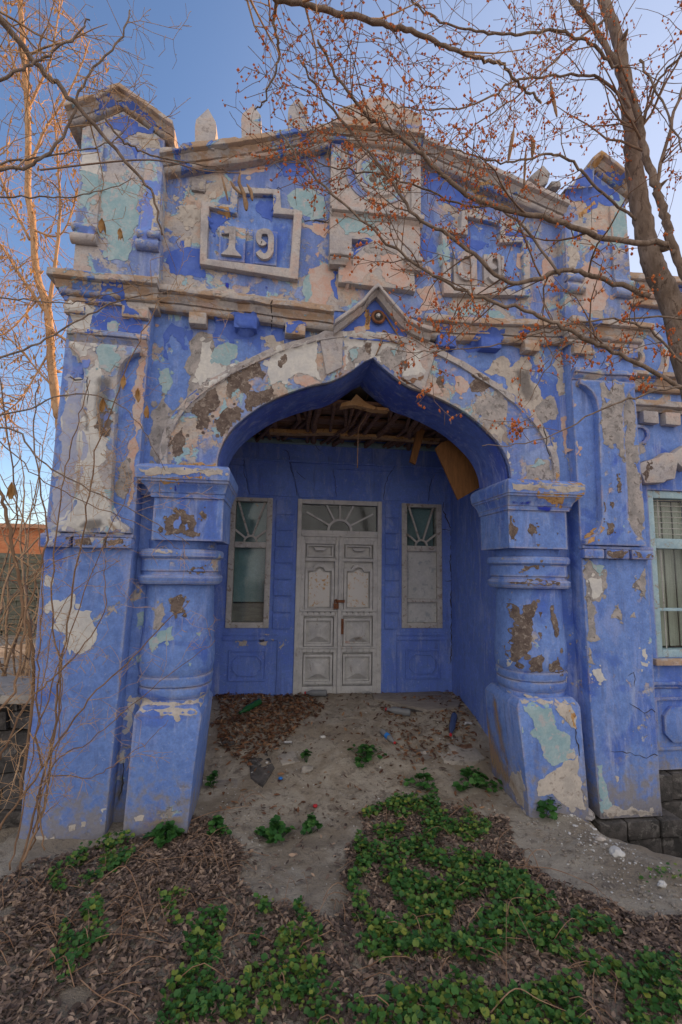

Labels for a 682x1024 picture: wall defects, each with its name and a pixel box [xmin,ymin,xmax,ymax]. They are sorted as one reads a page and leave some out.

peeling [75,152,234,301]
peeling [236,146,628,509]
peeling [44,278,322,554]
flaking render [504,379,654,685]
peeling [43,594,98,655]
peeling [122,692,206,735]
peeling [507,691,654,819]